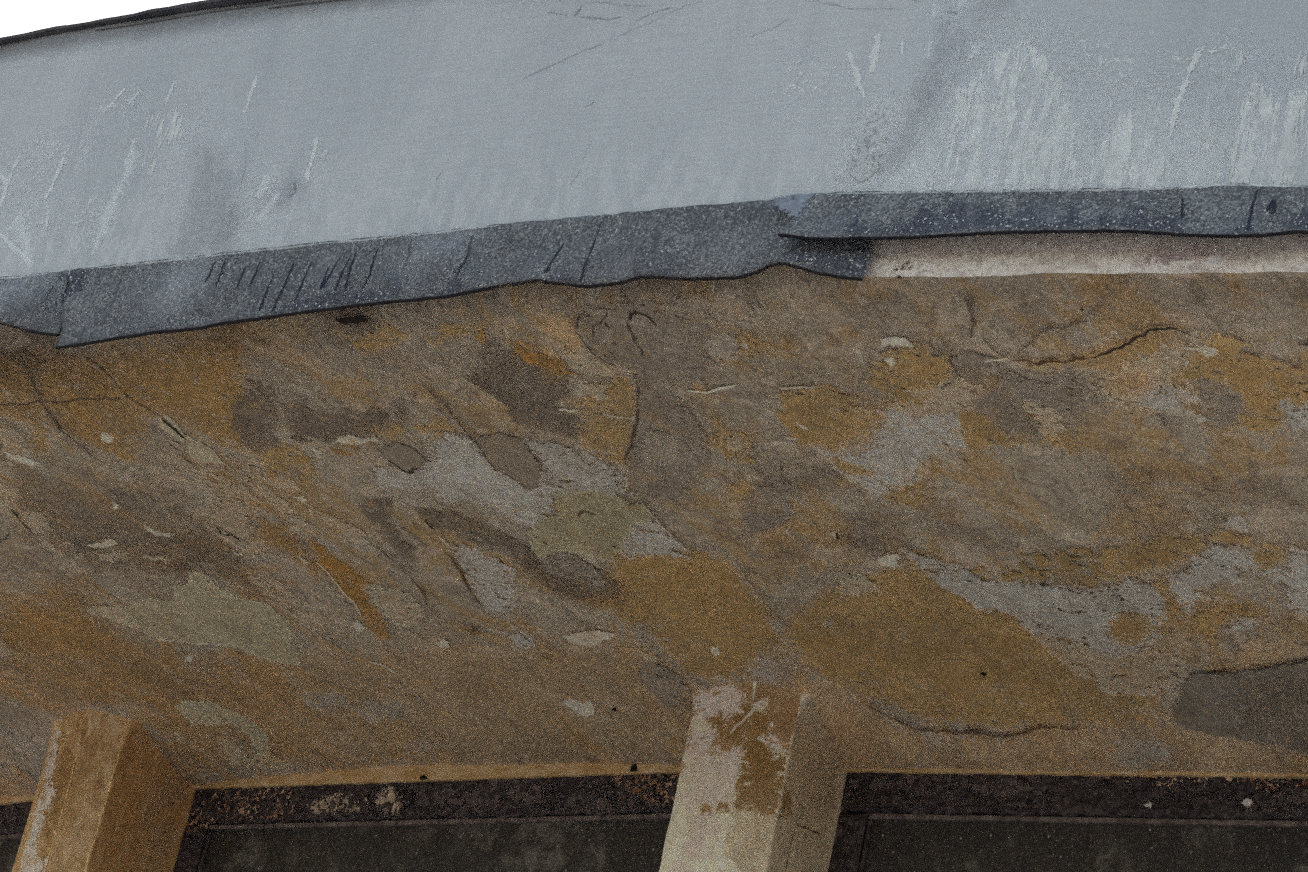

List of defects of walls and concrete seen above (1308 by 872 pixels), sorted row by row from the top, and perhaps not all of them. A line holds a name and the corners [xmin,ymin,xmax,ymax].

water stain [100,82,186,179]
water stain [783,34,1308,276]
water stain [237,239,412,313]
water stain [544,222,601,283]
crack [964,297,1190,366]
crack [0,357,157,465]
peeling [0,295,1308,872]
crack [859,699,1081,739]